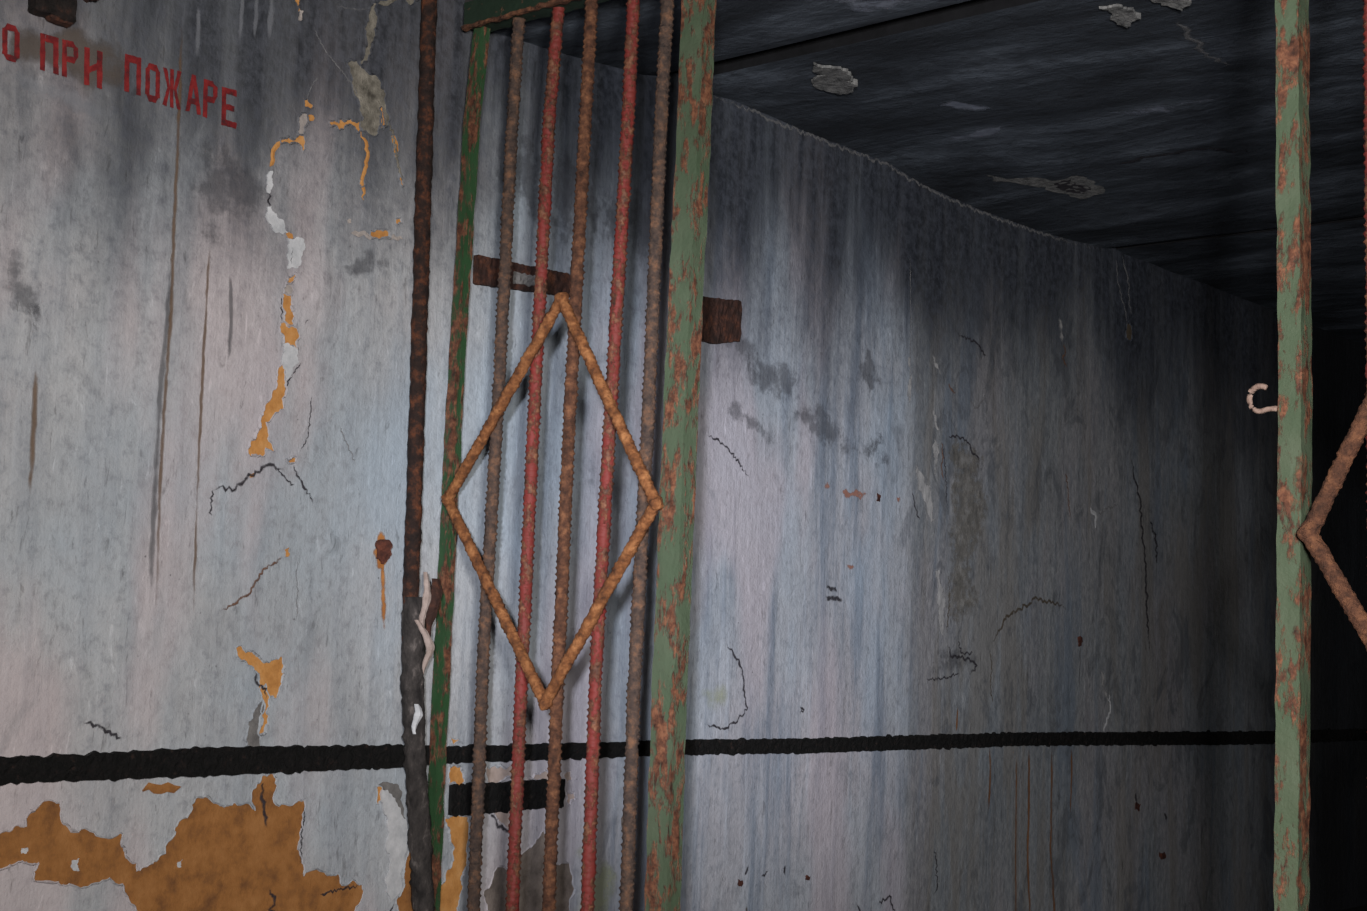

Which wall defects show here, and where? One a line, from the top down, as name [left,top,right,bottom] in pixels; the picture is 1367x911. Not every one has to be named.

peeling [1099,0,1192,28]
peeling [811,62,858,95]
spalling [988,175,1105,199]
peeling [246,0,421,465]
crack [209,463,313,514]
crack [711,435,747,475]
crack [225,548,299,614]
rust [374,533,393,620]
peeling [235,645,285,747]
crack [709,648,748,730]
crack [990,596,1061,701]
peeling [0,773,364,911]